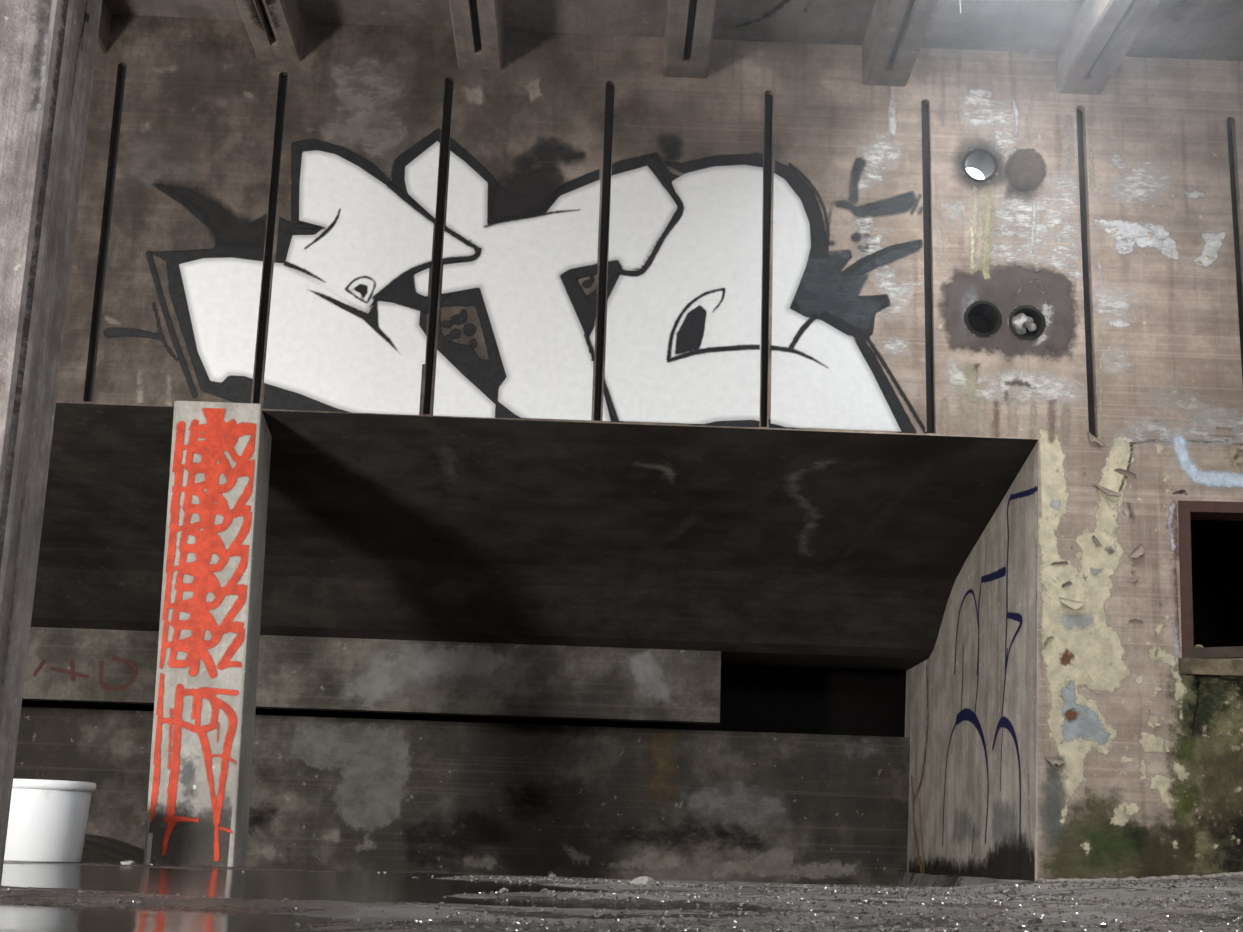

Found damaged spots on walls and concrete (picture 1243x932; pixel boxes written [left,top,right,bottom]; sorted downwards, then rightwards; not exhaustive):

peeling [1094,219,1179,260]
peeling [1194,231,1226,267]
peeling [1037,428,1243,864]